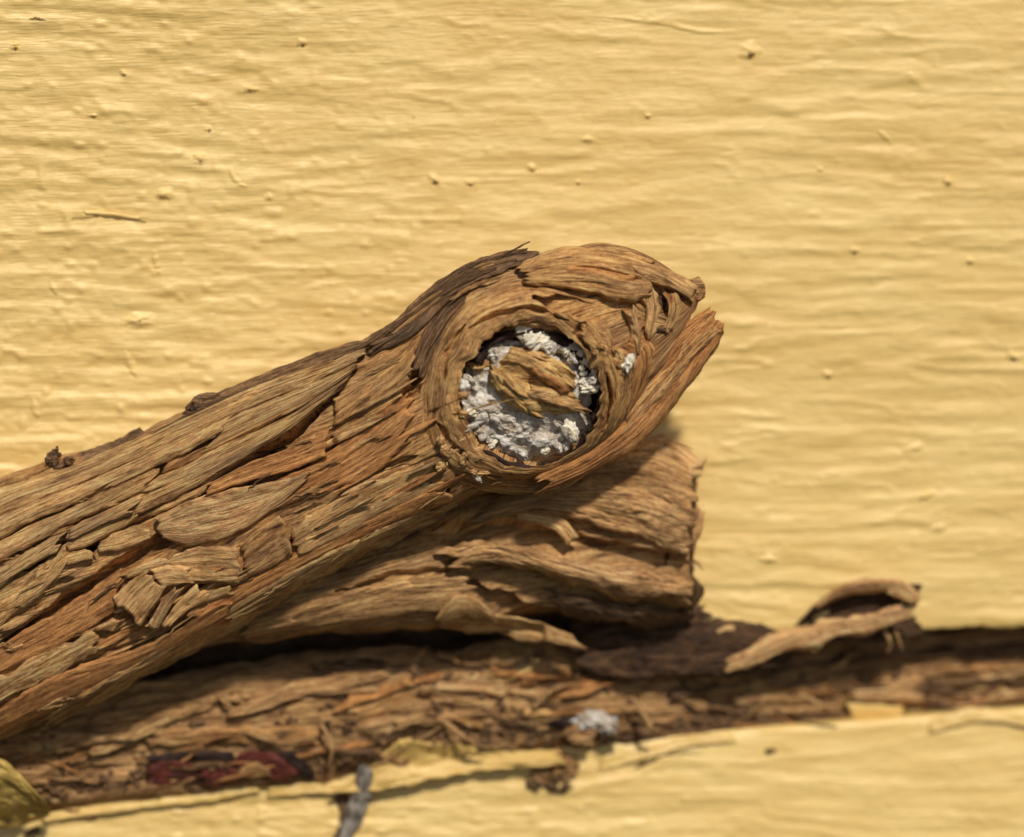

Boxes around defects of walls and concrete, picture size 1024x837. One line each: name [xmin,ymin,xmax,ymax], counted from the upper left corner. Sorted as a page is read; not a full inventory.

peeling [565,578,926,683]
peeling [846,703,905,718]
peeling [928,707,1024,733]